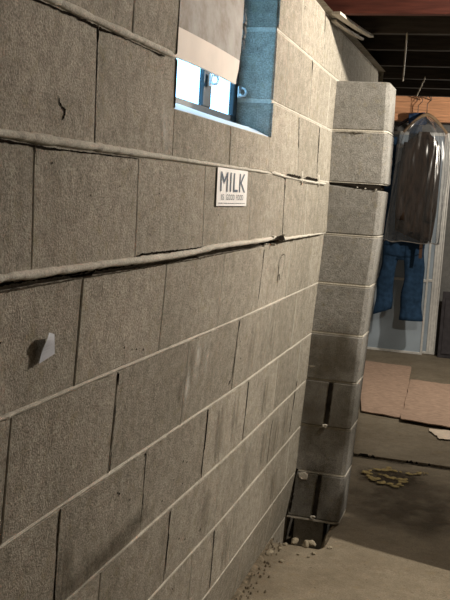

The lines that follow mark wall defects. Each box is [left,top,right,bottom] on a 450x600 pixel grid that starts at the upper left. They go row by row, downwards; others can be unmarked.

crack [0,0,165,165]
crack [0,130,381,298]
crack [353,453,449,469]